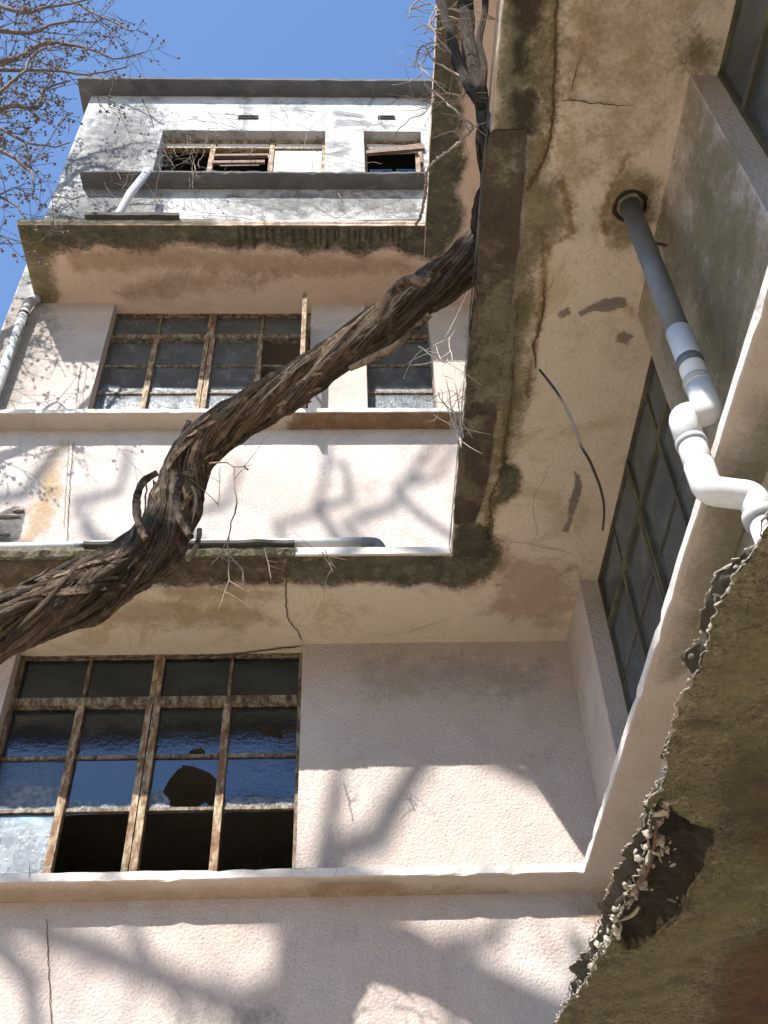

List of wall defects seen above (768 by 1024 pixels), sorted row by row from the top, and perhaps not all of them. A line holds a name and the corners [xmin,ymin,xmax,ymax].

leakage [512,0,543,75]
leakage [510,91,533,134]
crack [519,0,633,192]
leakage [0,0,467,405]
leakage [602,80,768,452]
leakage [0,559,72,590]
crack [26,559,304,659]
leakage [156,557,286,587]
spalling [553,511,768,1024]
crack [45,919,53,1024]